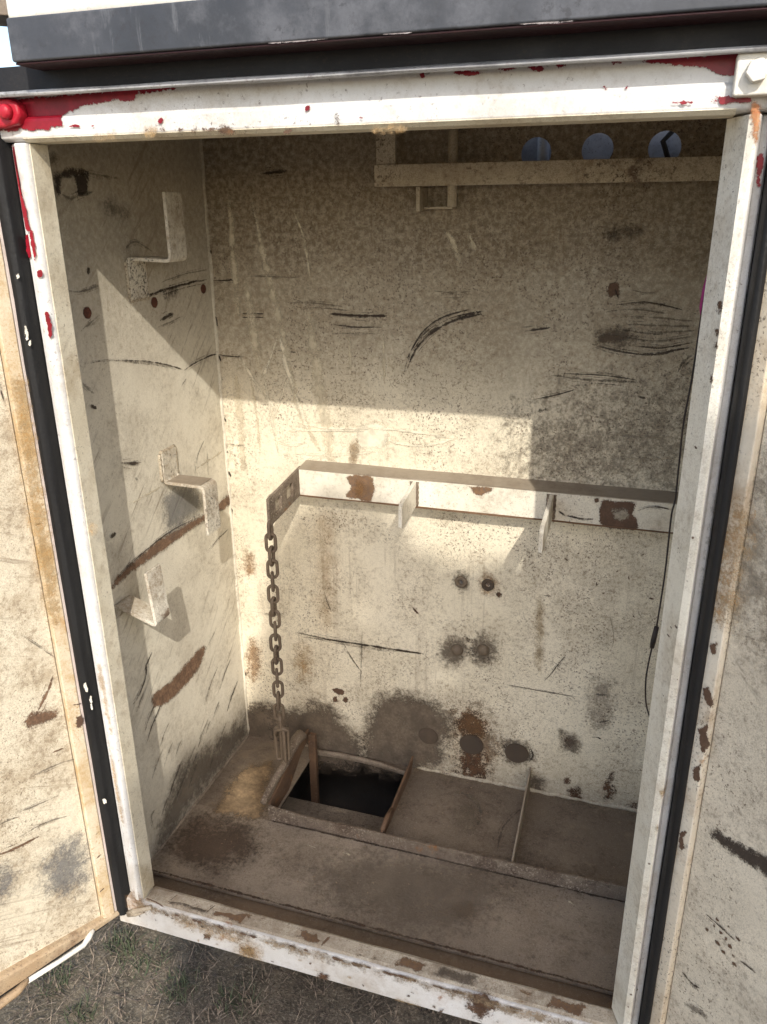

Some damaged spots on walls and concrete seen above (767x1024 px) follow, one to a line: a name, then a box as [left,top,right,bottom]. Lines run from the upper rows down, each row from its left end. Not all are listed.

peeling [642,54,738,76]
peeling [0,87,176,132]
rust [346,474,375,502]
rust [599,500,639,530]
water stain [438,633,498,666]
rust [25,678,58,731]
rust [449,700,502,780]